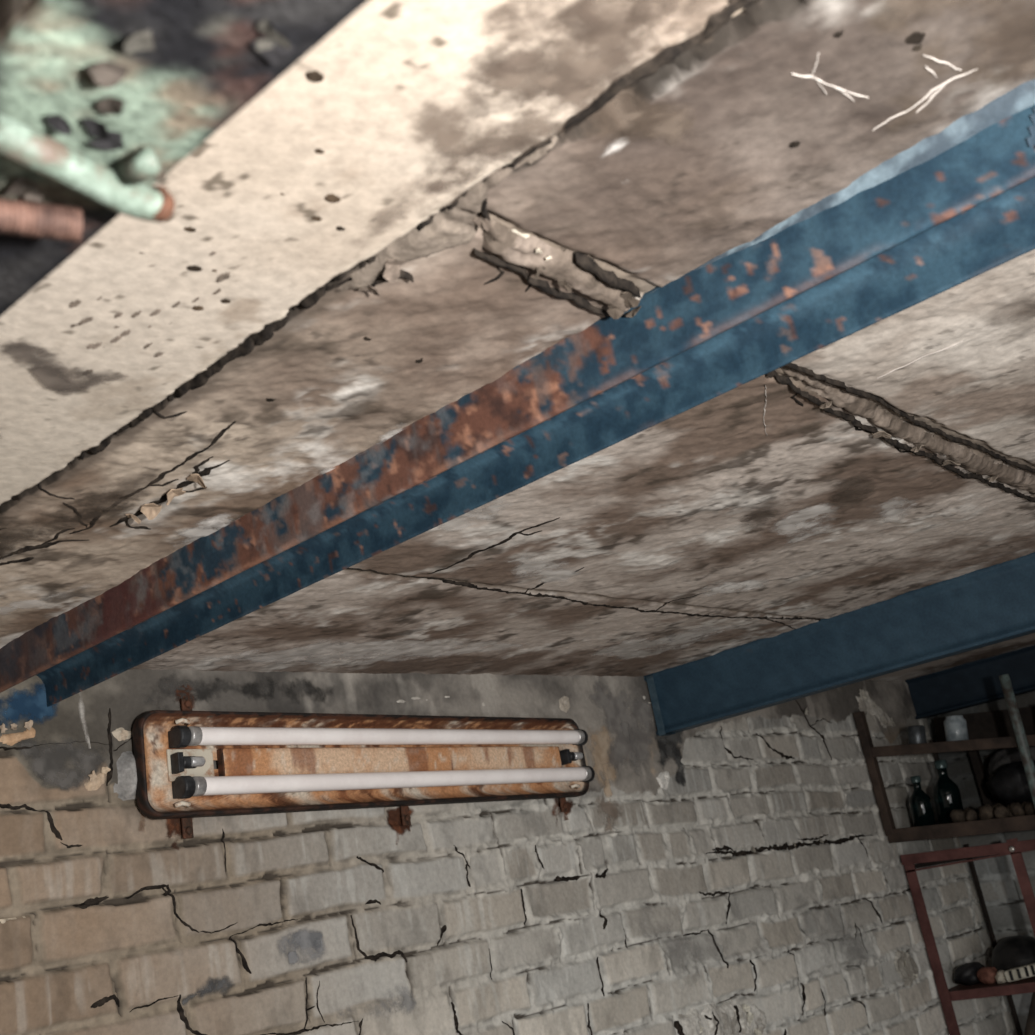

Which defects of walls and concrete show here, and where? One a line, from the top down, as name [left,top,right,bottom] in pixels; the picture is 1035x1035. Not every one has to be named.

damp [419,0,721,192]
crack [416,138,552,231]
crack [473,248,641,317]
damp [30,366,124,393]
crack [0,255,376,566]
crack [767,363,1035,503]
damp [180,515,228,544]
crack [347,517,821,630]
damp [223,641,519,663]
flaking render [0,720,43,751]
corrosion [387,807,413,834]
corrosion [552,798,573,820]